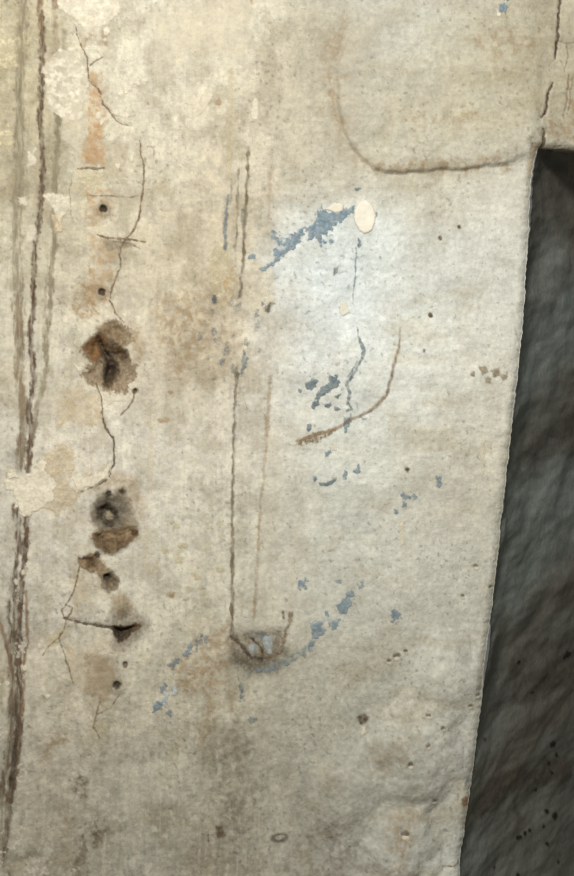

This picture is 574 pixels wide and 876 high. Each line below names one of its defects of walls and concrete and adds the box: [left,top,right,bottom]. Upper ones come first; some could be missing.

crack [76,29,127,125]
crack [540,75,569,148]
crack [553,0,561,57]
crack [97,143,145,321]
crack [81,383,135,492]
crack [48,566,116,682]